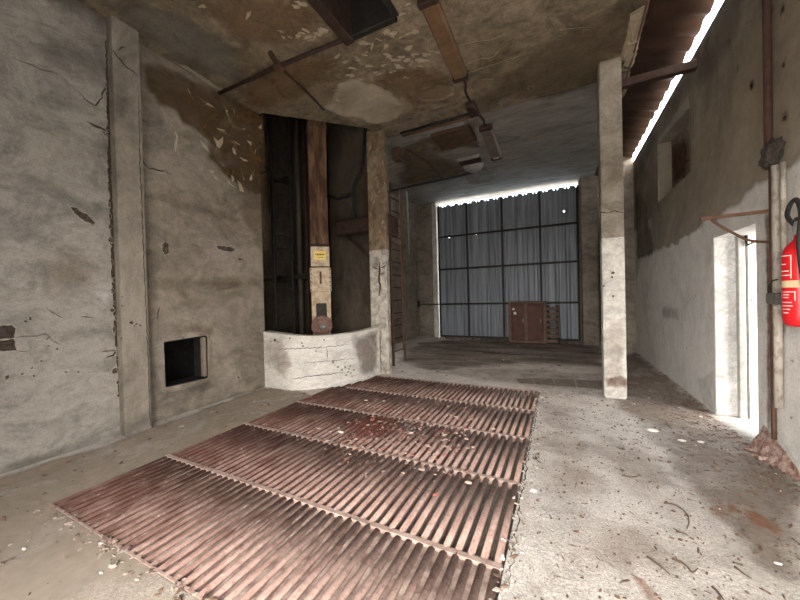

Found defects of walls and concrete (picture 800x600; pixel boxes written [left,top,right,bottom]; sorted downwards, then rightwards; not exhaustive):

peeling [276,27,329,41]
crack [110,45,138,76]
crack [14,58,110,138]
crack [143,160,172,175]
spalling [70,207,96,226]
spalling [104,40,123,424]
crack [373,262,386,296]
spalling [0,317,32,353]
crack [265,343,360,379]
water stain [356,333,376,372]